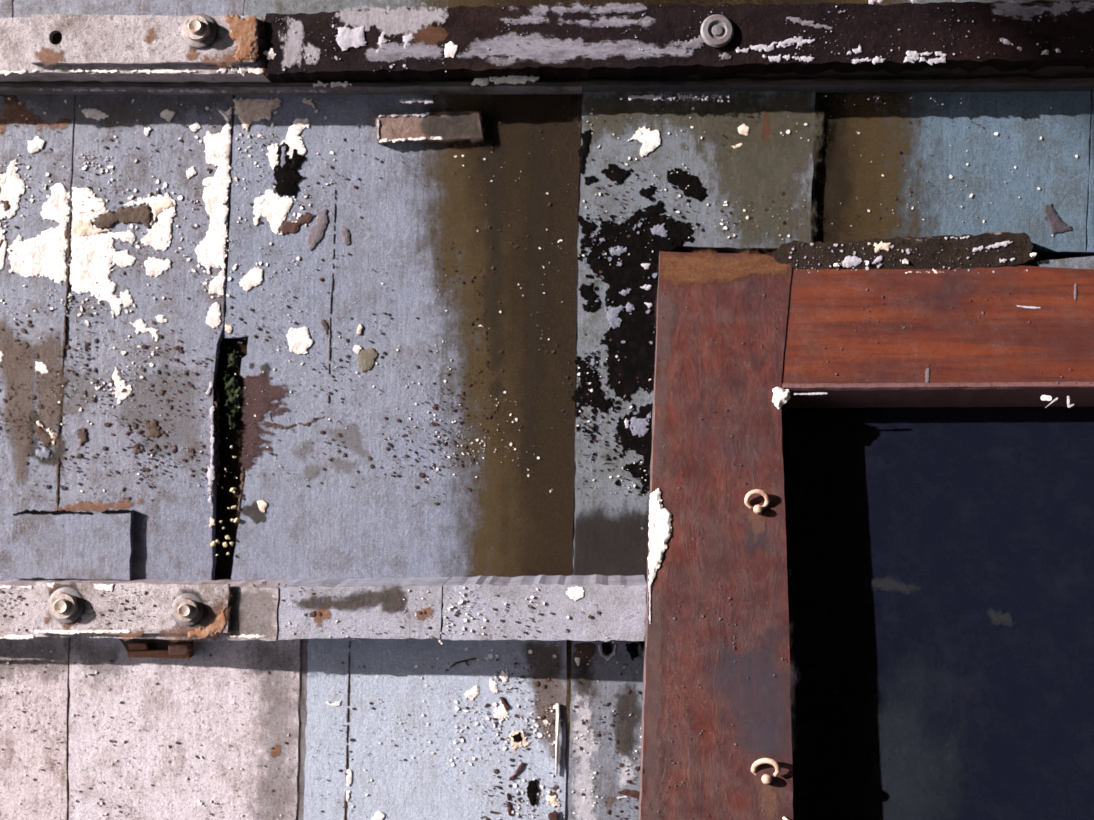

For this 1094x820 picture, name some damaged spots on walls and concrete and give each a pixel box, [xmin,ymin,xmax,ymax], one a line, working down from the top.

corrosion [185,13,266,74]
peeling [217,16,320,76]
peeling [335,2,705,87]
water stain [421,0,901,9]
peeling [719,17,833,62]
peeling [904,51,947,65]
peeling [0,159,176,315]
peeling [148,81,352,333]
water stain [0,321,63,476]
crack [210,190,336,580]
water stain [417,94,649,584]
peeling [570,167,707,498]